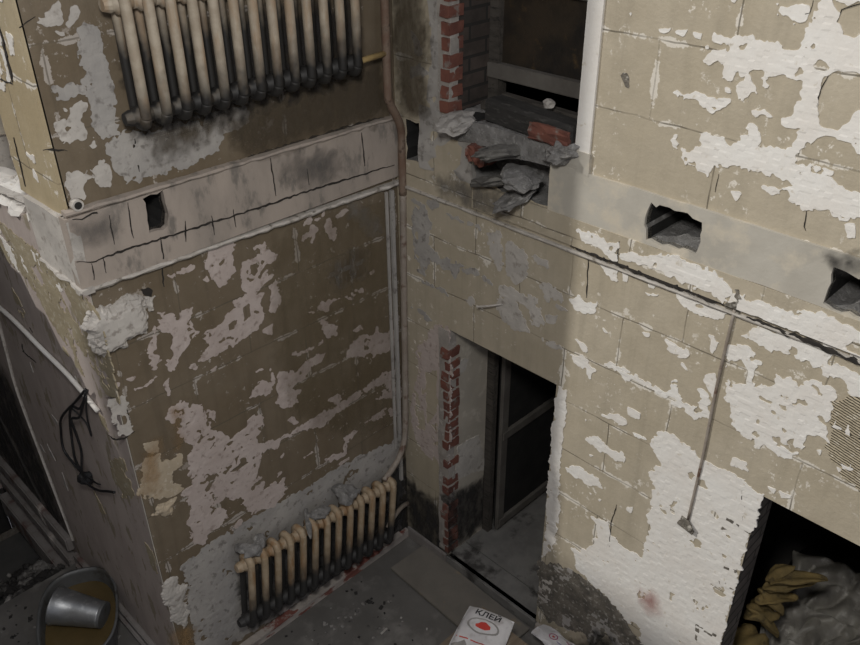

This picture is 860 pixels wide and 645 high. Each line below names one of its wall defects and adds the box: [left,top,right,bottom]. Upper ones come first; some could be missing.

peeling [37,0,250,200]
crack [61,117,394,287]
peeling [0,222,484,645]
peeling [301,209,349,244]
peeling [486,229,598,333]
crack [570,245,723,306]
peeling [536,386,791,645]
peeling [541,229,860,492]
peeling [659,0,860,238]
crack [746,316,860,365]